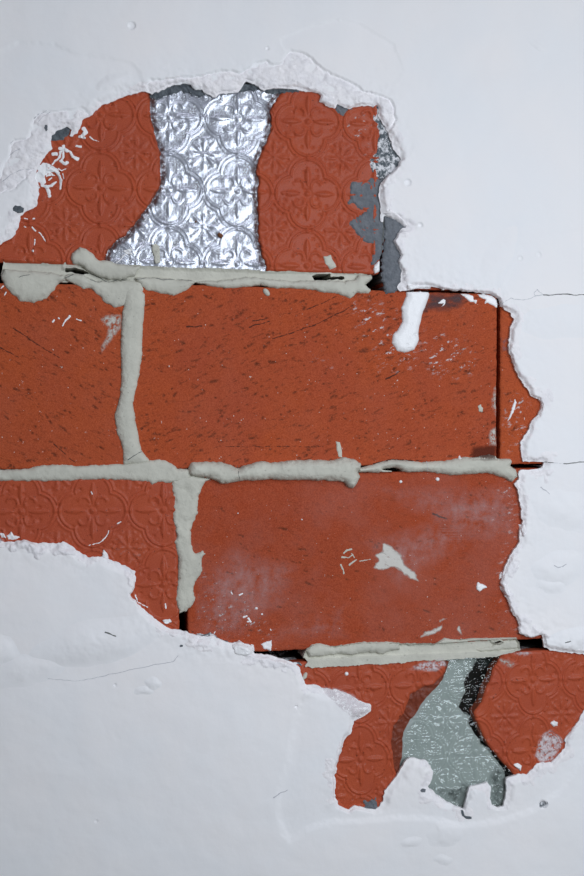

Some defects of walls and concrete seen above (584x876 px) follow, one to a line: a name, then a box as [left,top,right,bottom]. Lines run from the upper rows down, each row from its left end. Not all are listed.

flaking render [0,52,584,654]
crack [497,289,584,305]
flaking render [0,532,371,814]
flaking render [417,711,584,822]